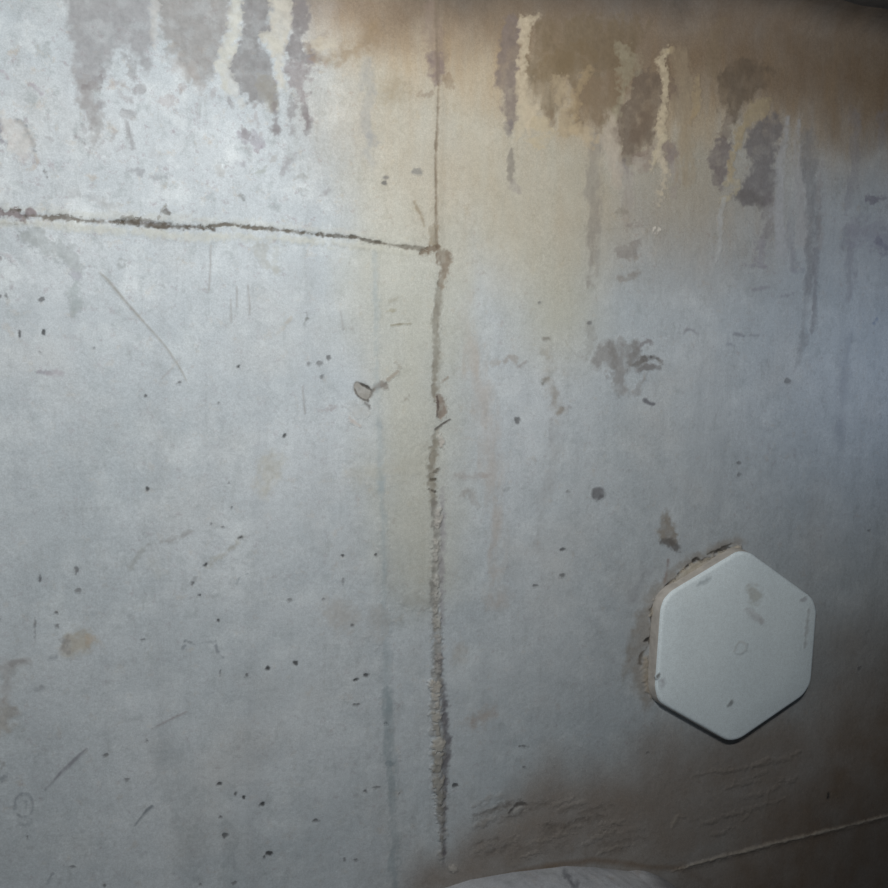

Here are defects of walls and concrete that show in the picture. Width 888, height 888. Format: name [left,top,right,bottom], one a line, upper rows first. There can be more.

leakage [50,0,346,193]
crack [0,0,458,874]
leakage [578,317,666,407]
leakage [491,5,888,370]